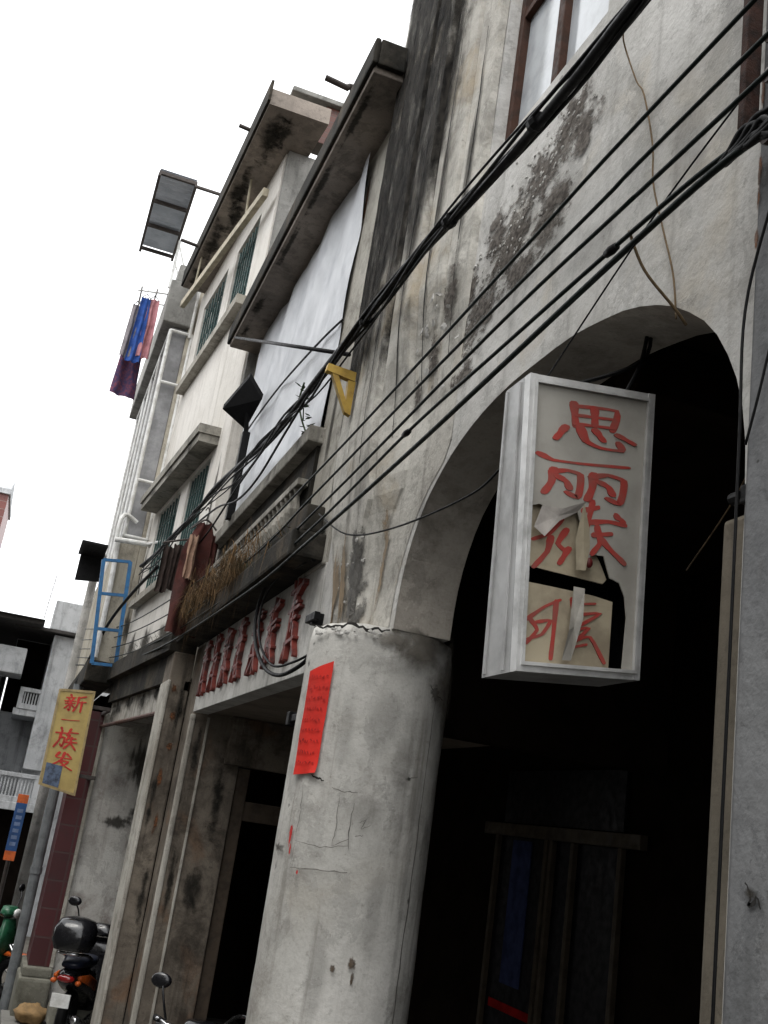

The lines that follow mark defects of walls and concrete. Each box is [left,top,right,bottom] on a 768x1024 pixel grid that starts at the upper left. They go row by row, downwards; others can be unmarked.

damp [346,90,371,137]
damp [190,116,292,283]
damp [305,165,332,215]
damp [350,0,467,379]
damp [462,123,475,198]
damp [325,394,342,458]
damp [105,740,157,829]
damp [136,871,148,920]